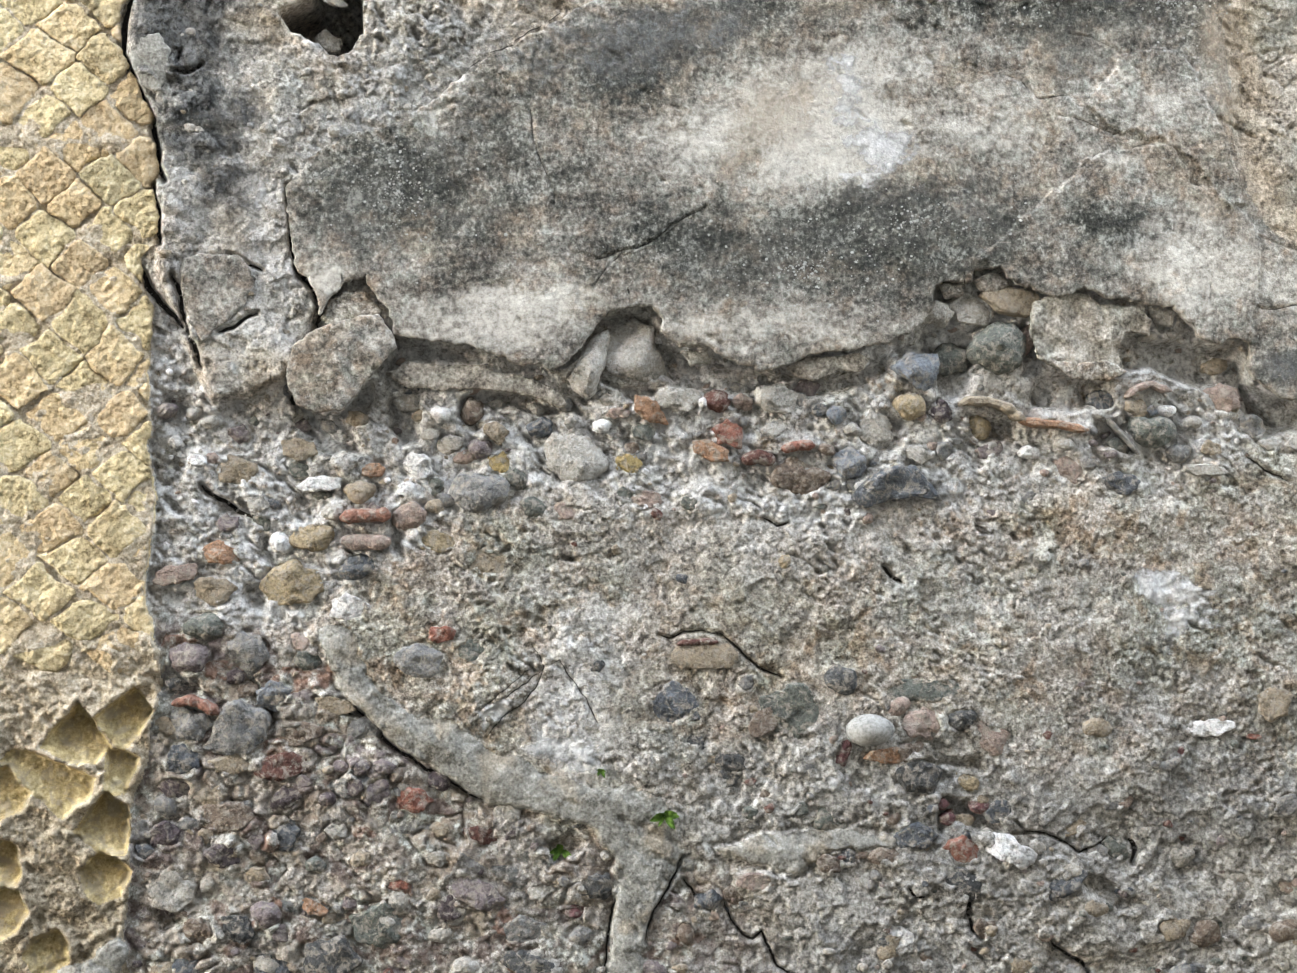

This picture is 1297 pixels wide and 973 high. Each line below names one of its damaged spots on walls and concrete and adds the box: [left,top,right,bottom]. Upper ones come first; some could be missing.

crack [287,203,325,328]
crack [596,209,702,282]
crack [143,270,257,366]
spalling [276,242,1297,626]
peeling [824,664,867,696]
spalling [0,687,177,905]
peeling [682,735,782,829]
spalling [0,839,70,973]
peeling [193,931,279,973]
peeling [921,867,998,969]
peeling [1003,818,1206,921]
peeling [1238,877,1297,945]